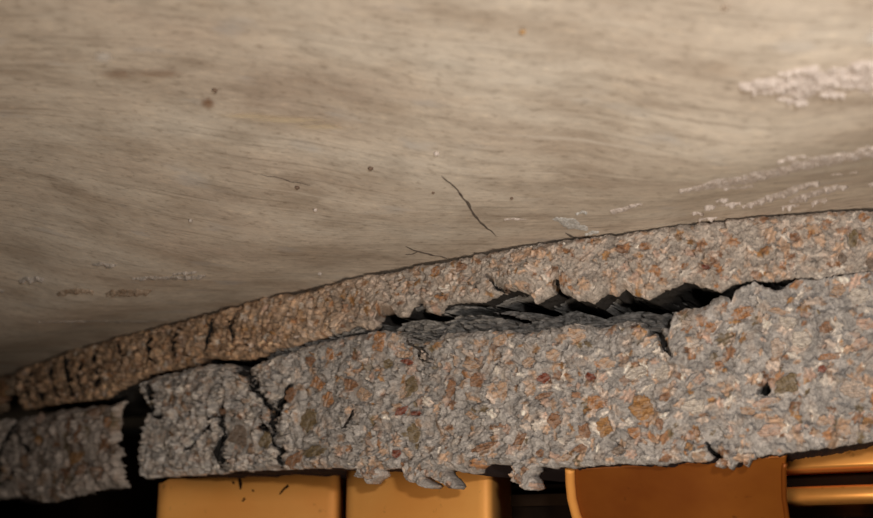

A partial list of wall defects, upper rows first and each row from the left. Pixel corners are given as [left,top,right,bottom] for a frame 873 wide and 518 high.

crack [441,176,496,236]
crack [0,352,101,486]
crack [145,384,163,419]
crack [145,327,181,364]
crack [185,401,230,468]
crack [204,315,237,354]
crack [239,279,693,465]